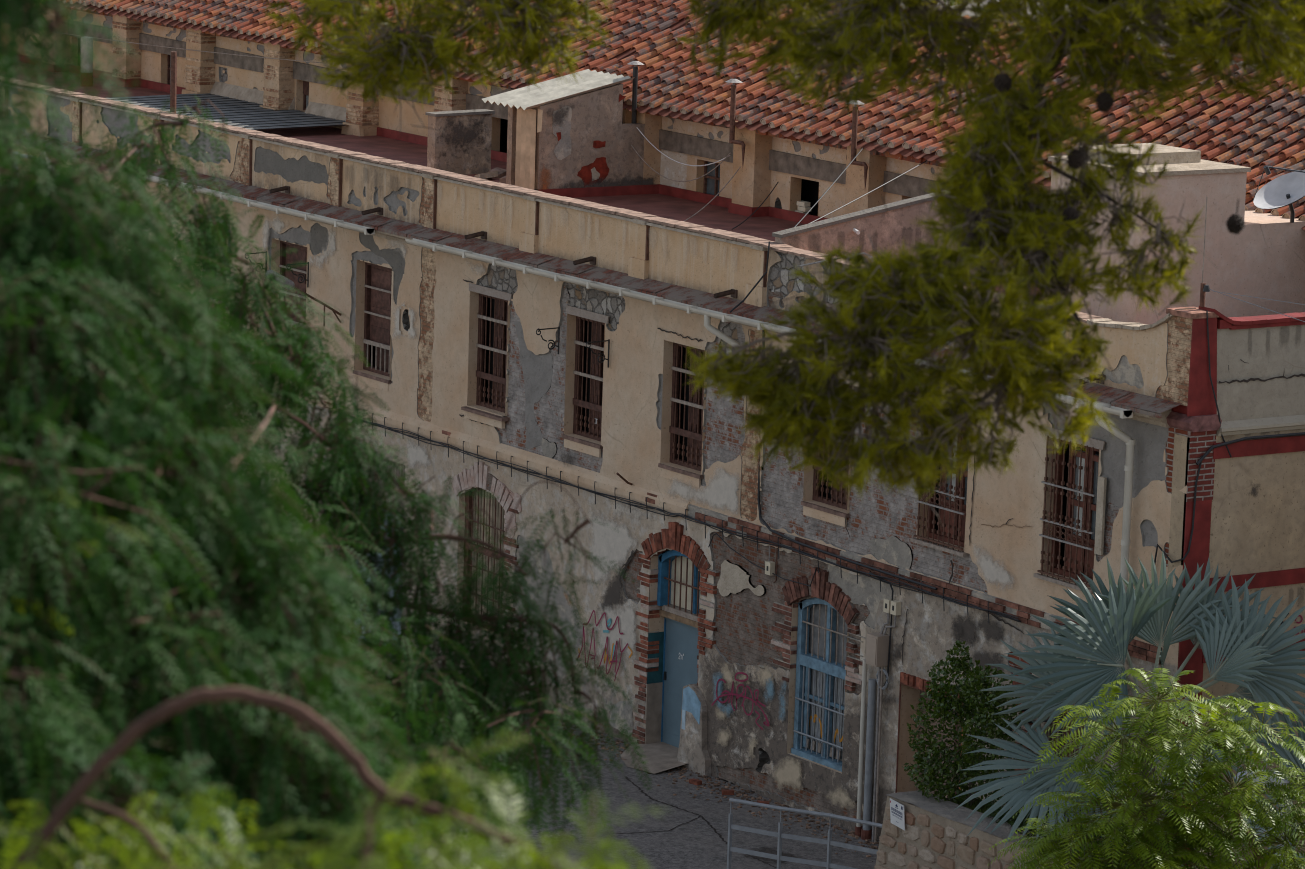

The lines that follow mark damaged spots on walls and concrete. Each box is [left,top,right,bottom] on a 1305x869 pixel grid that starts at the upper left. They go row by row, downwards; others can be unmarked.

spalling [347,177,425,224]
spalling [577,140,609,186]
flaking render [476,264,625,473]
flaking render [1102,316,1193,406]
crack [1218,359,1305,384]
flaking render [701,320,988,593]
flaking render [709,531,828,684]